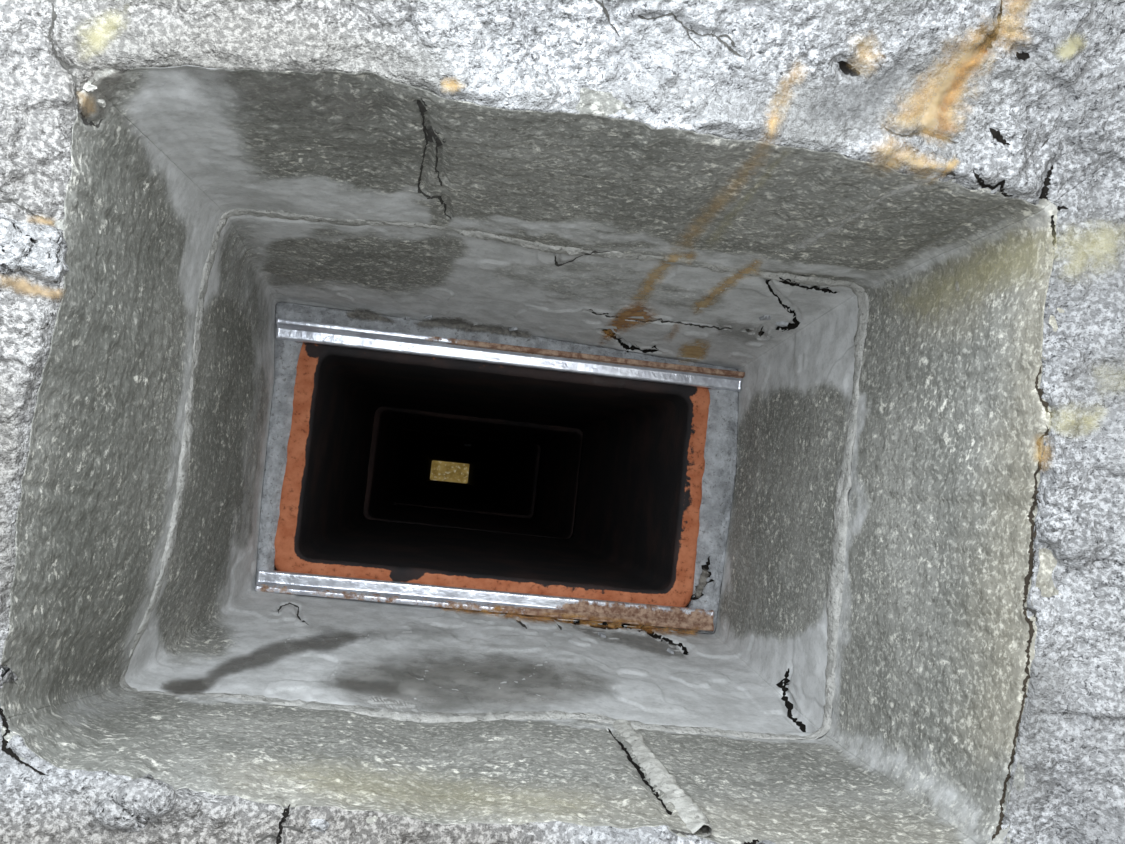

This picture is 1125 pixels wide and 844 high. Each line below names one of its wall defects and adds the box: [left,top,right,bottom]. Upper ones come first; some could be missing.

crack [595,0,741,56]
crack [417,98,451,219]
rust [603,254,693,339]
crack [586,277,837,353]
rust [464,606,696,635]
crack [992,365,1053,840]
leakage [166,634,356,692]
crack [776,668,806,732]
crack [0,708,46,775]
crack [608,729,696,835]